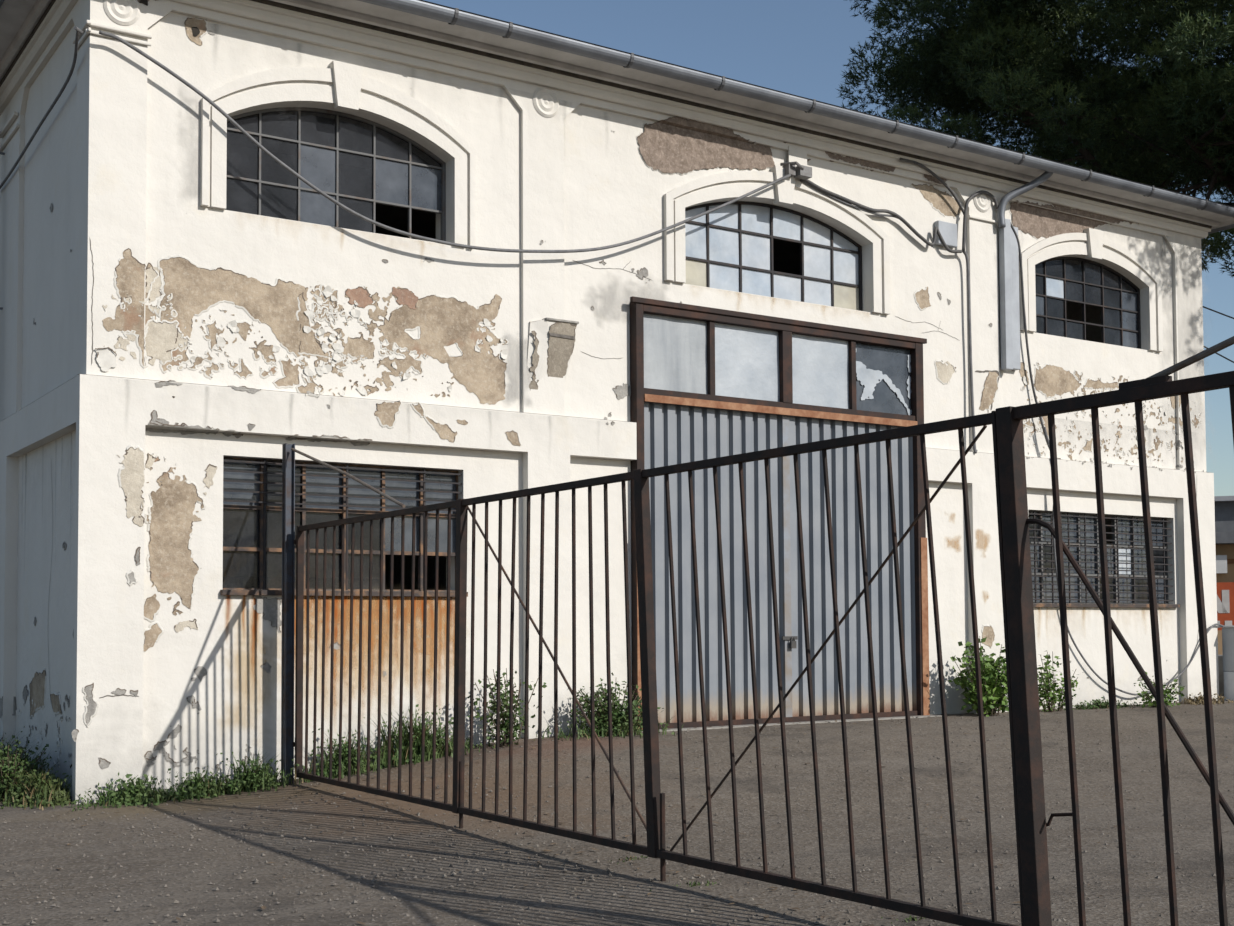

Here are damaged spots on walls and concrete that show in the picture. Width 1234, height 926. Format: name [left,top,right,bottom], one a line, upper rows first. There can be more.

spalling [636,116,775,176]
spalling [910,183,962,219]
spalling [1008,200,1147,240]
flaking render [102,248,509,442]
flaking render [1019,360,1209,473]
flaking render [117,445,217,651]
corrosion [227,595,258,665]
corrosion [294,596,455,691]
flaking render [0,668,99,768]
peeling [111,688,138,696]
peeling [144,724,200,769]